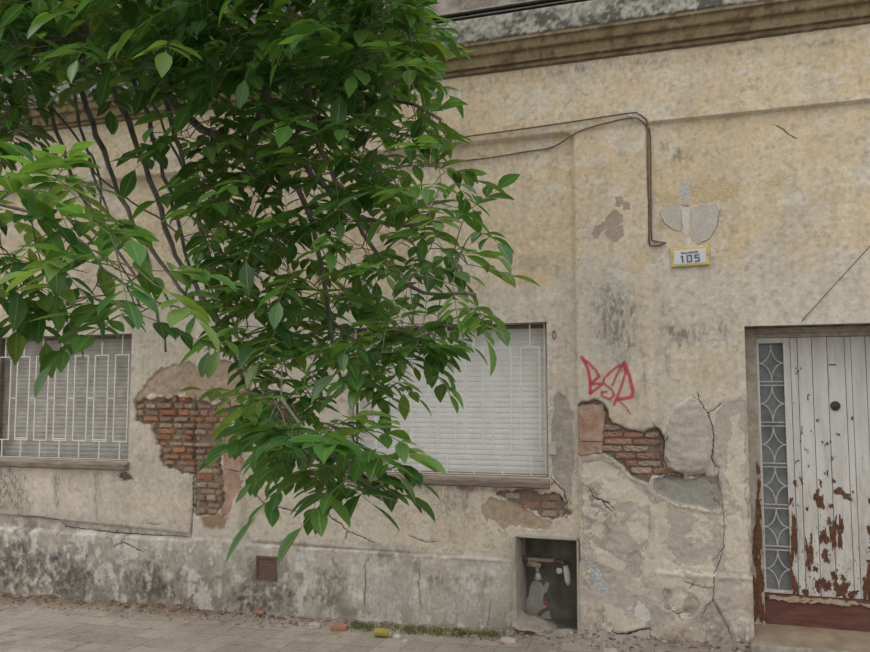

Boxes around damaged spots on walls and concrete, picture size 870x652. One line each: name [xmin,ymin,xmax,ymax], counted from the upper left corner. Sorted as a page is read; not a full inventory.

peeling [591,196,630,242]
peeling [654,174,742,243]
water stain [0,544,92,593]
flaking render [133,360,252,517]
peeling [391,389,870,642]
crack [667,393,732,639]